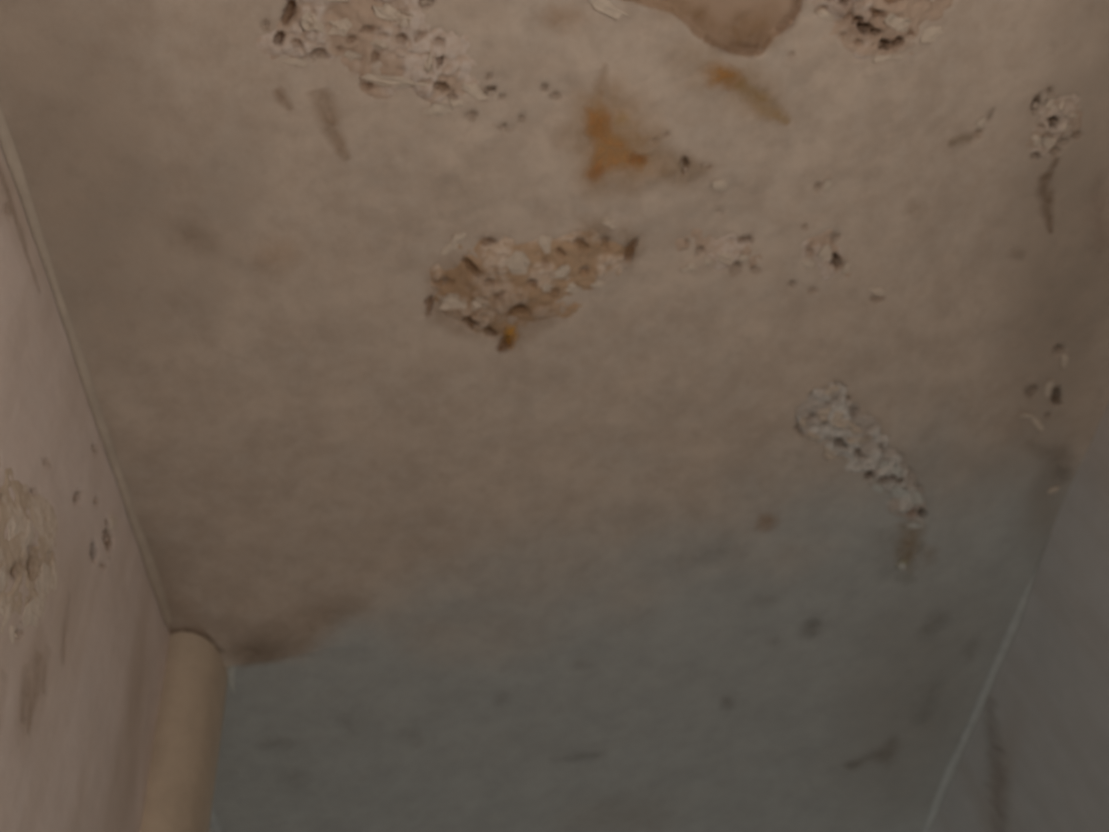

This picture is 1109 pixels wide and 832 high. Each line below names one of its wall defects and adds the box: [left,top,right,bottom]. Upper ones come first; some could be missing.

flaking render [256,0,495,116]
flaking render [589,0,953,62]
flaking render [1025,94,1083,158]
flaking render [426,217,635,351]